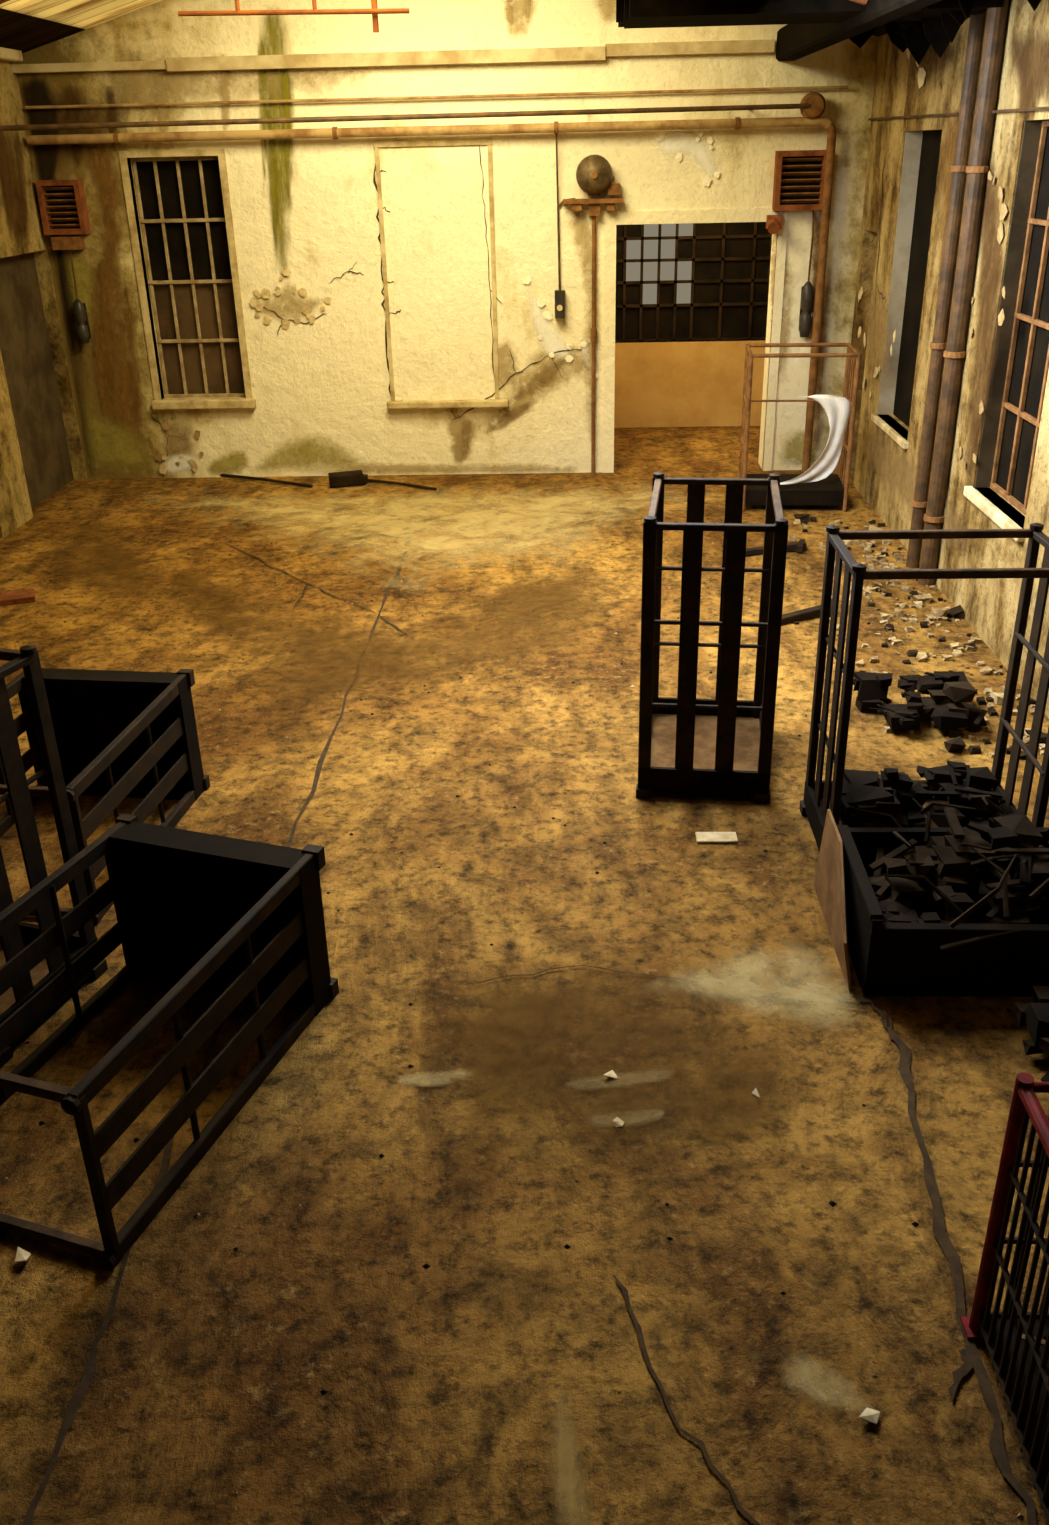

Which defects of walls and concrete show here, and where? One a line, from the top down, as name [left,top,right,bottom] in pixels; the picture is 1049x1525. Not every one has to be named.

damp [107,43,351,245]
peeling [249,268,331,329]
crack [223,504,423,848]
crack [23,1245,132,1525]